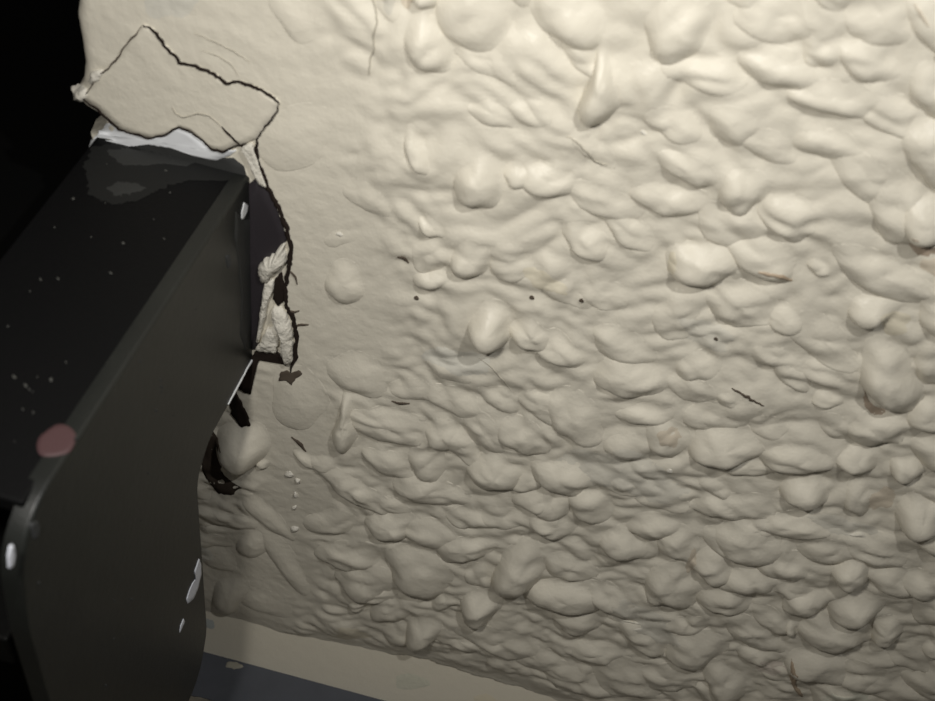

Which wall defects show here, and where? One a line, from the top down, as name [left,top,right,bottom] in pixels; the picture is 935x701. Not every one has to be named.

peeling [71,24,302,428]
crack [83,25,309,373]